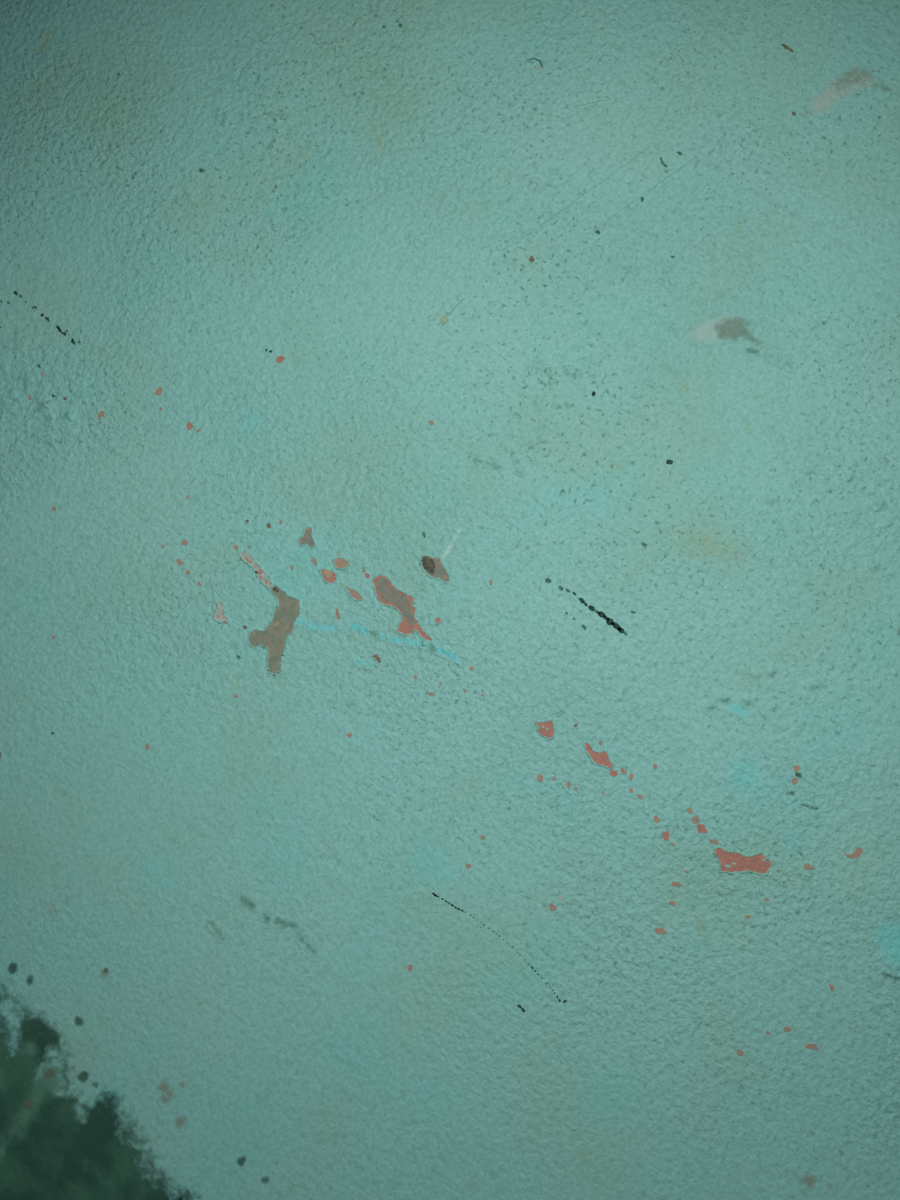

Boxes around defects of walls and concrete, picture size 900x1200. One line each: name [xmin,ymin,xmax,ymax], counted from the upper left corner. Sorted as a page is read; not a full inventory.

peeling [233,545,303,677]
peeling [297,526,443,646]
peeling [419,553,453,585]
peeling [534,718,556,741]
peeling [582,740,643,799]
peeling [653,808,773,877]